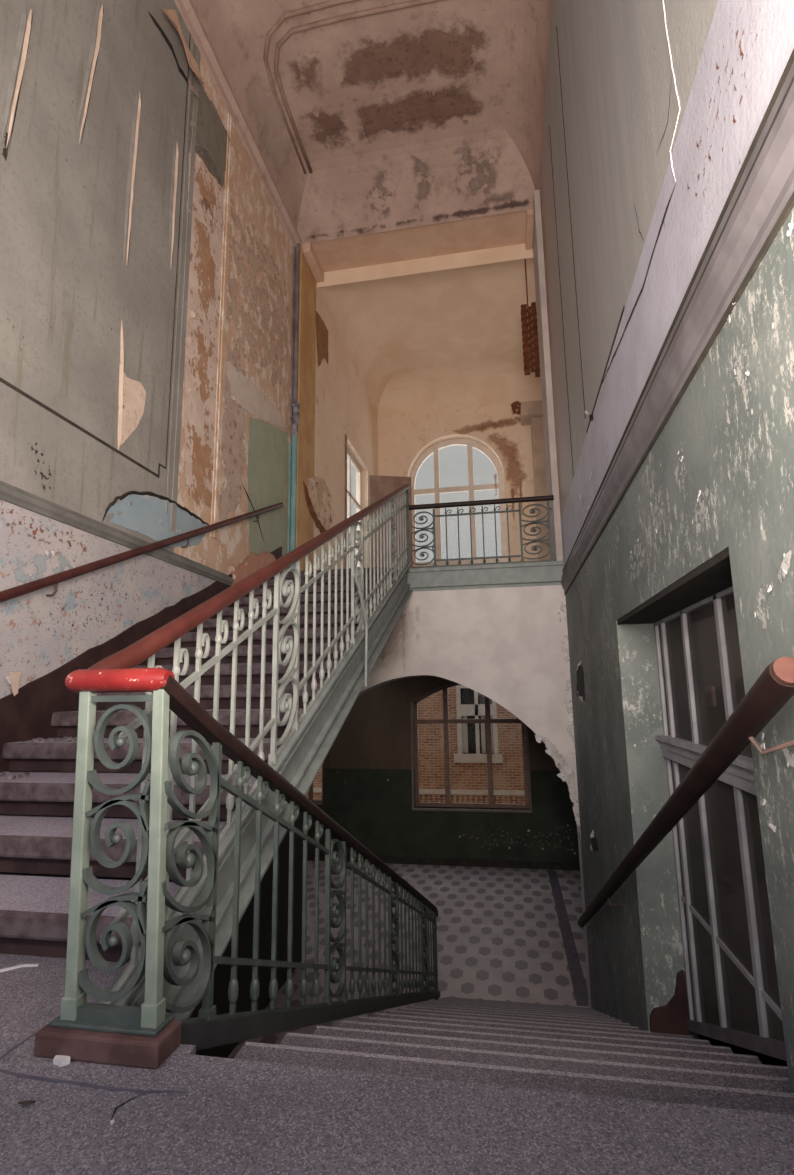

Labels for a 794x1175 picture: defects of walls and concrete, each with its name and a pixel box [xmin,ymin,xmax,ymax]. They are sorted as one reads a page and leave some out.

crack [1,3,33,160]
crack [75,0,104,144]
crack [123,89,141,266]
peeling [309,104,346,149]
peeling [343,26,484,138]
crack [601,0,680,385]
corrosion [688,31,757,196]
peeling [102,152,289,547]
peeling [693,487,710,537]
peeling [754,550,792,629]
peeling [6,671,21,696]
peeling [782,748,794,768]